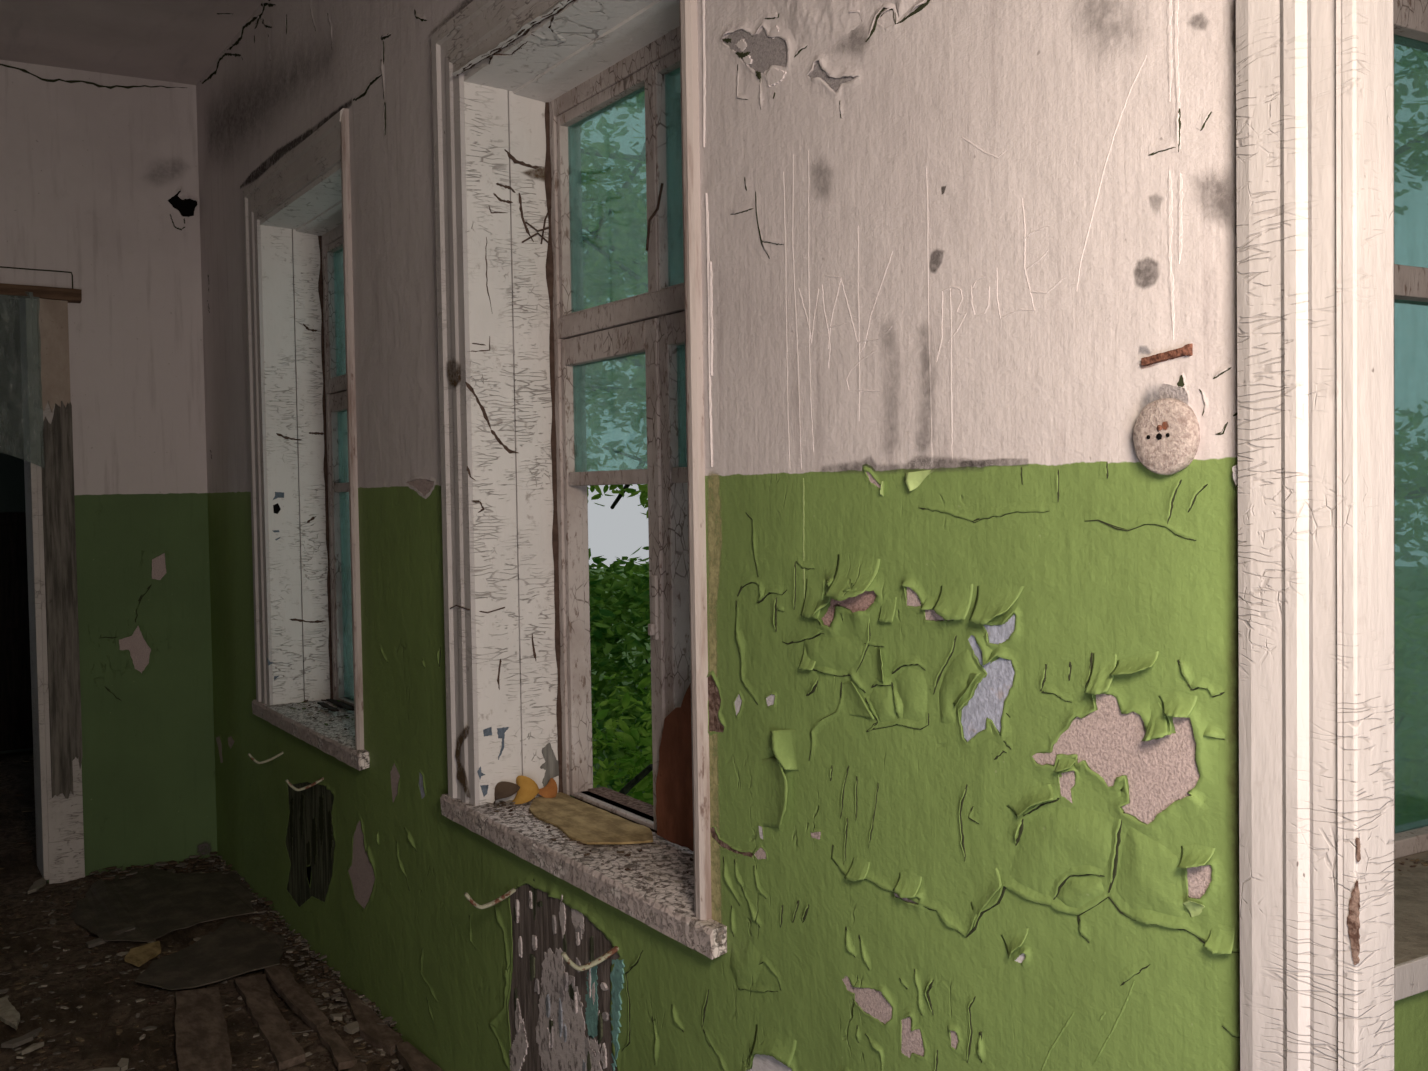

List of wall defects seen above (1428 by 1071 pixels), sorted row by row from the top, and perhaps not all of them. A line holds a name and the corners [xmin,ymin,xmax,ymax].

crack [0,0,333,89]
spalling [717,15,867,107]
rust [1140,343,1193,368]
peeling [905,469,936,491]
flaking render [284,777,377,915]
spalling [706,671,745,738]
peeling [710,729,799,862]
peeling [798,550,1026,754]
peeling [1007,651,1219,841]
peeling [1177,844,1235,954]
flaking render [505,870,626,1071]
peeling [840,970,965,1067]